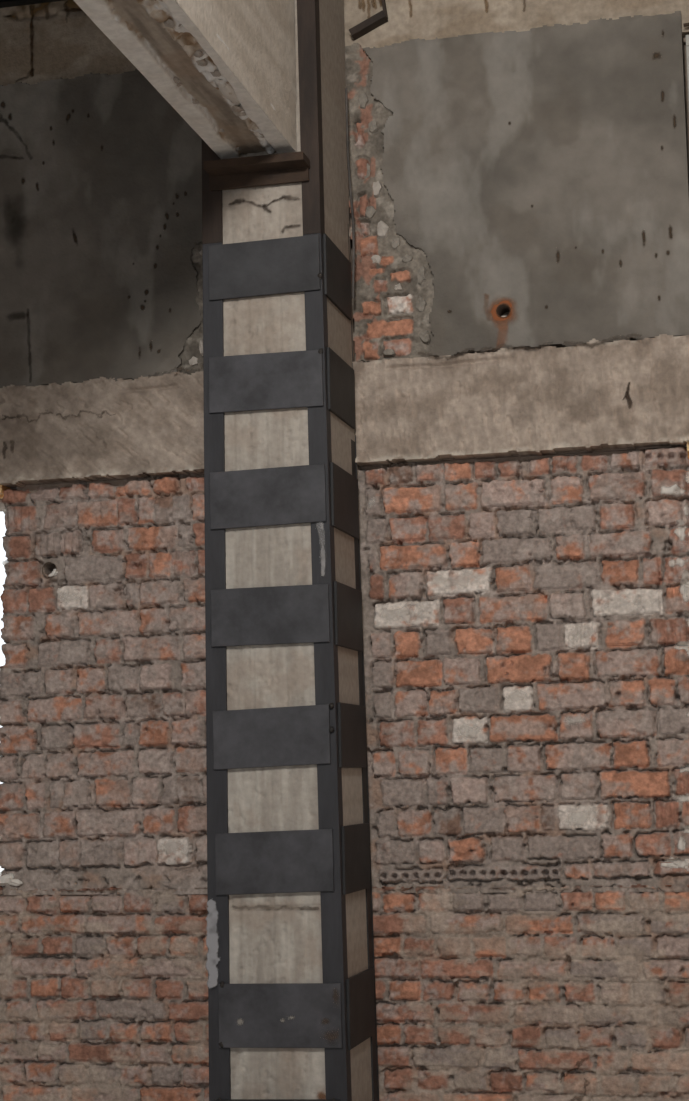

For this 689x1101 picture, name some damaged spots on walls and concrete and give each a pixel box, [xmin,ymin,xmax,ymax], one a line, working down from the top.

crack [16,5,34,82]
spalling [106,0,275,155]
crack [229,196,300,232]
flaking render [345,43,434,362]
flaking render [177,242,203,375]
corrosion [485,295,513,331]